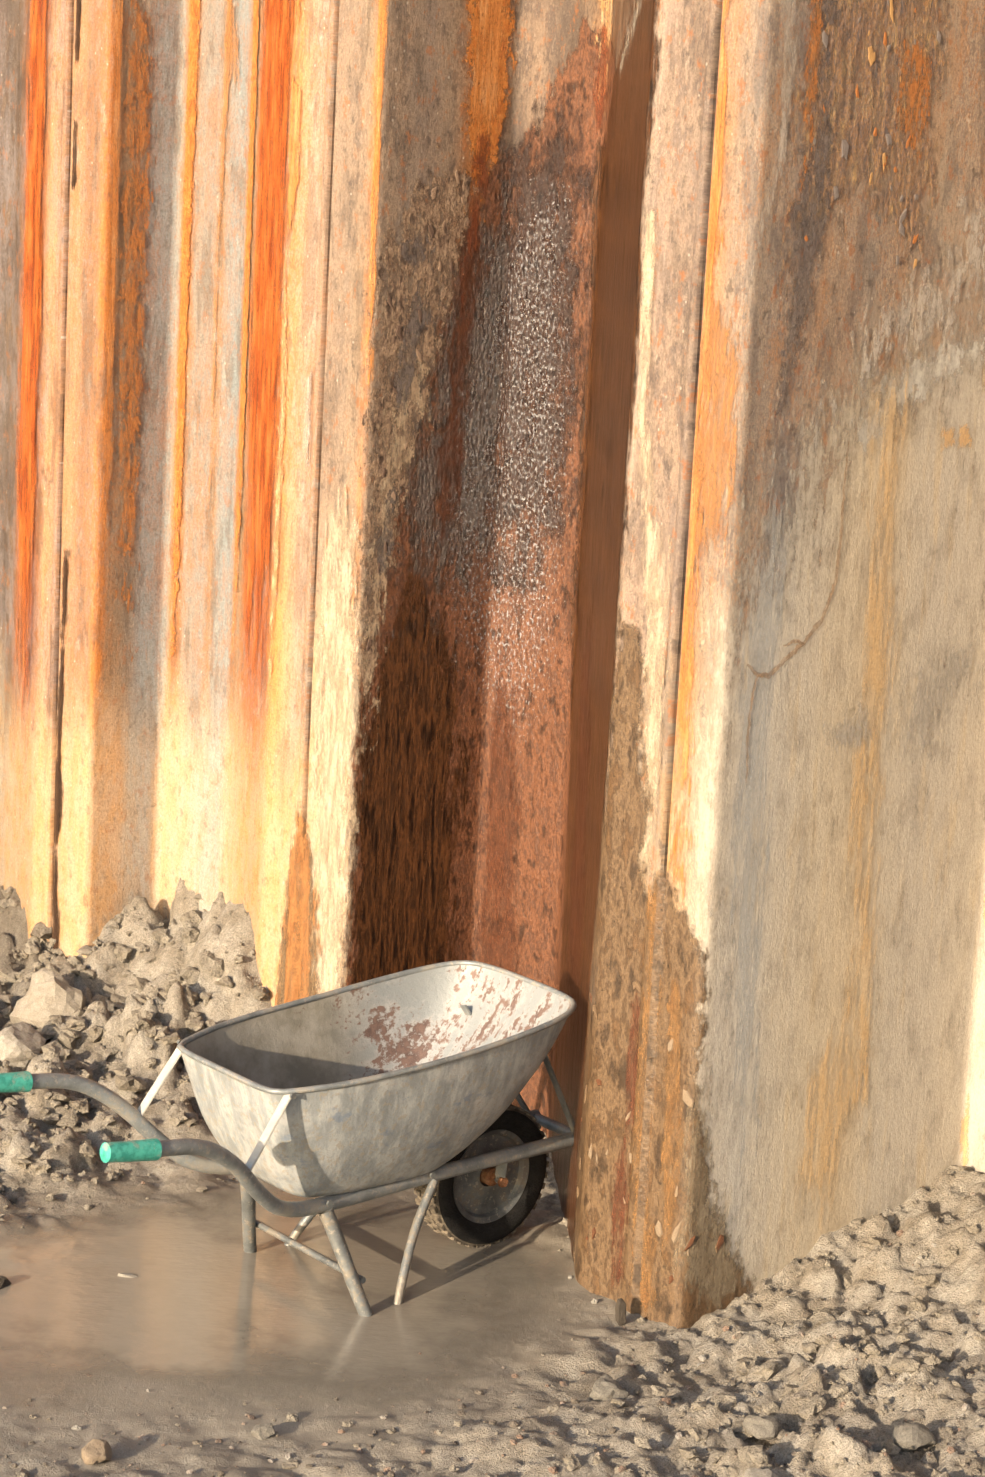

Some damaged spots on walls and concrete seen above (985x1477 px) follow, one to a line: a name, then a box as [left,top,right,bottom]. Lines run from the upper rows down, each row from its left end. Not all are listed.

rust [15,0,48,697]
rust [169,0,200,656]
rust [217,0,301,682]
rust [353,0,518,765]
water stain [311,0,985,1314]
rust [669,0,749,897]
crack [746,441,849,782]
peeling [576,1144,626,1240]
peeling [654,1201,695,1256]
peeling [682,1085,694,1108]